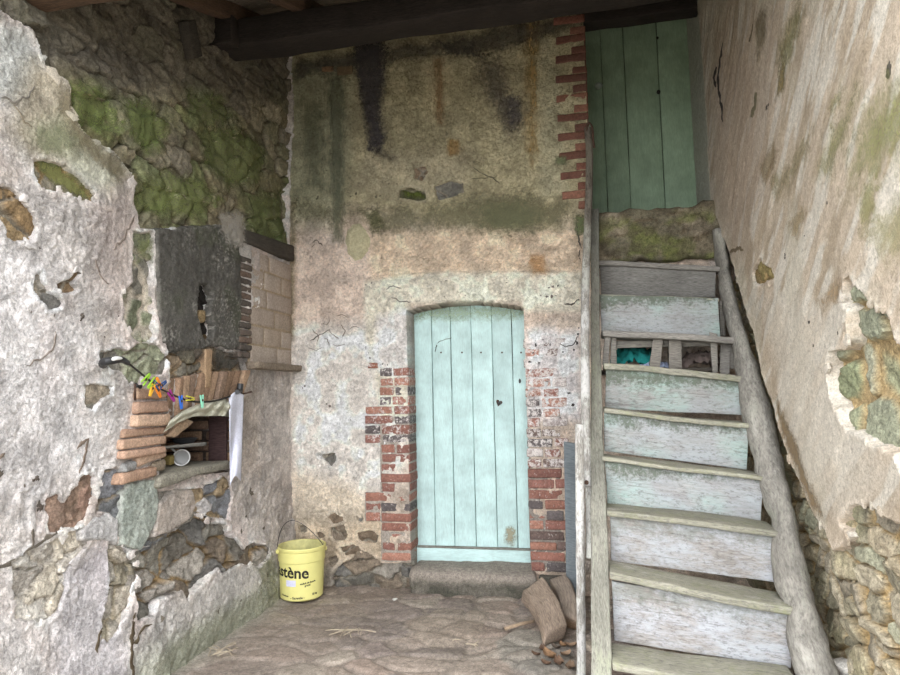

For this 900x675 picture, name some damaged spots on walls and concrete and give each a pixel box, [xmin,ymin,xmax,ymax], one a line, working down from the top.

spalling [0,0,301,410]
water stain [329,77,345,240]
water stain [353,41,388,152]
crack [713,42,723,122]
water stain [756,13,765,54]
crack [310,314,359,351]
spalling [10,468,269,644]
flaking render [295,347,418,590]
flaking render [523,327,579,572]
spalling [728,254,900,675]